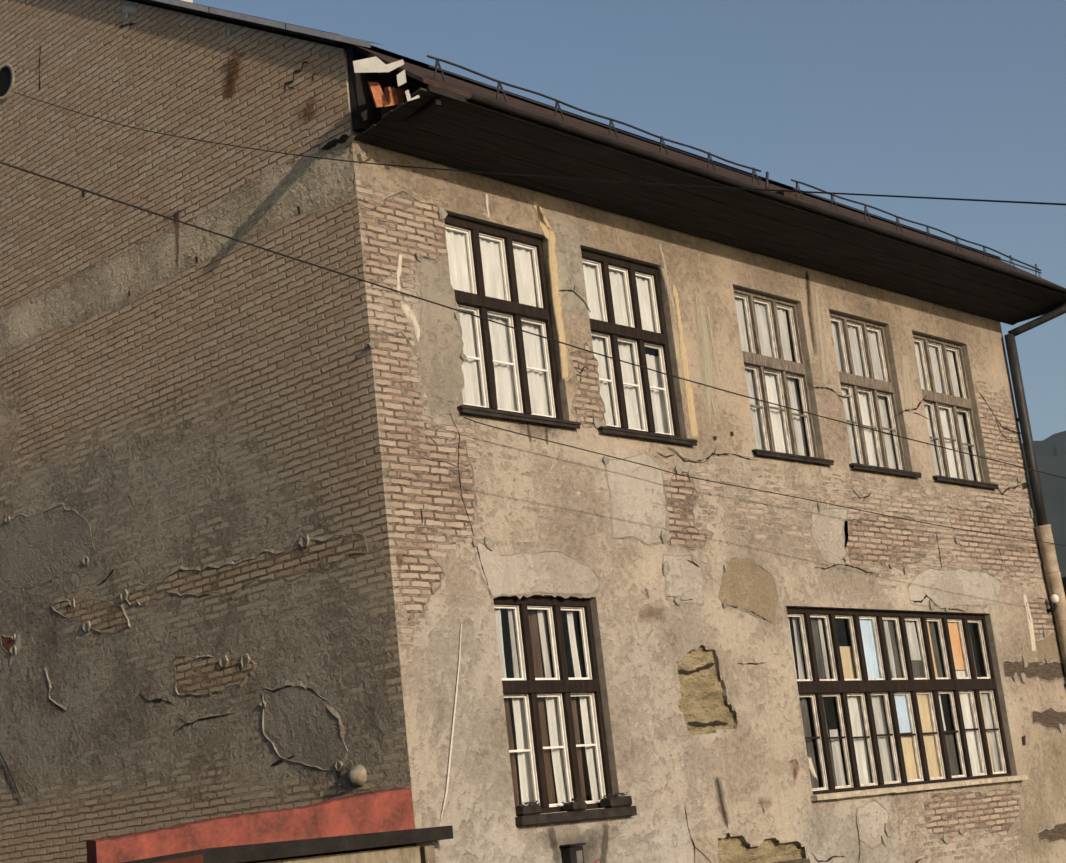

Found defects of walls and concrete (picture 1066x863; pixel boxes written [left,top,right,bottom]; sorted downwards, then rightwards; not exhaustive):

spalling [357,190,600,625]
crack [979,392,1021,442]
crack [656,447,756,463]
peeling [602,452,714,607]
peeling [718,557,779,626]
spalling [811,502,1041,612]
spalling [1002,596,1066,684]
crack [139,694,234,732]
crack [265,685,327,701]
spalling [669,635,744,746]
spalling [1030,708,1066,733]
spalling [706,823,816,863]